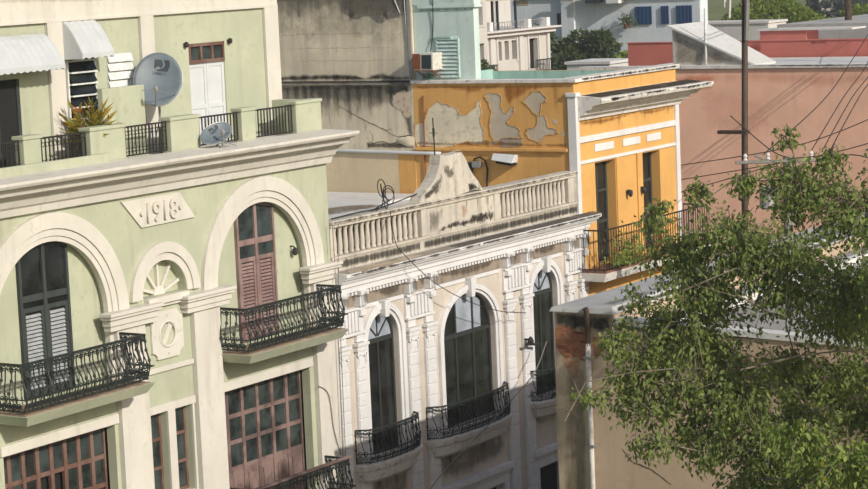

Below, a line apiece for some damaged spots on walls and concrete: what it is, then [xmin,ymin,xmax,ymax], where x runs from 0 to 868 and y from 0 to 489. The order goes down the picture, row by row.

leakage [281,75,409,101]
crack [336,104,414,147]
peeling [392,90,566,152]
leakage [328,166,602,276]
spalling [555,325,603,361]